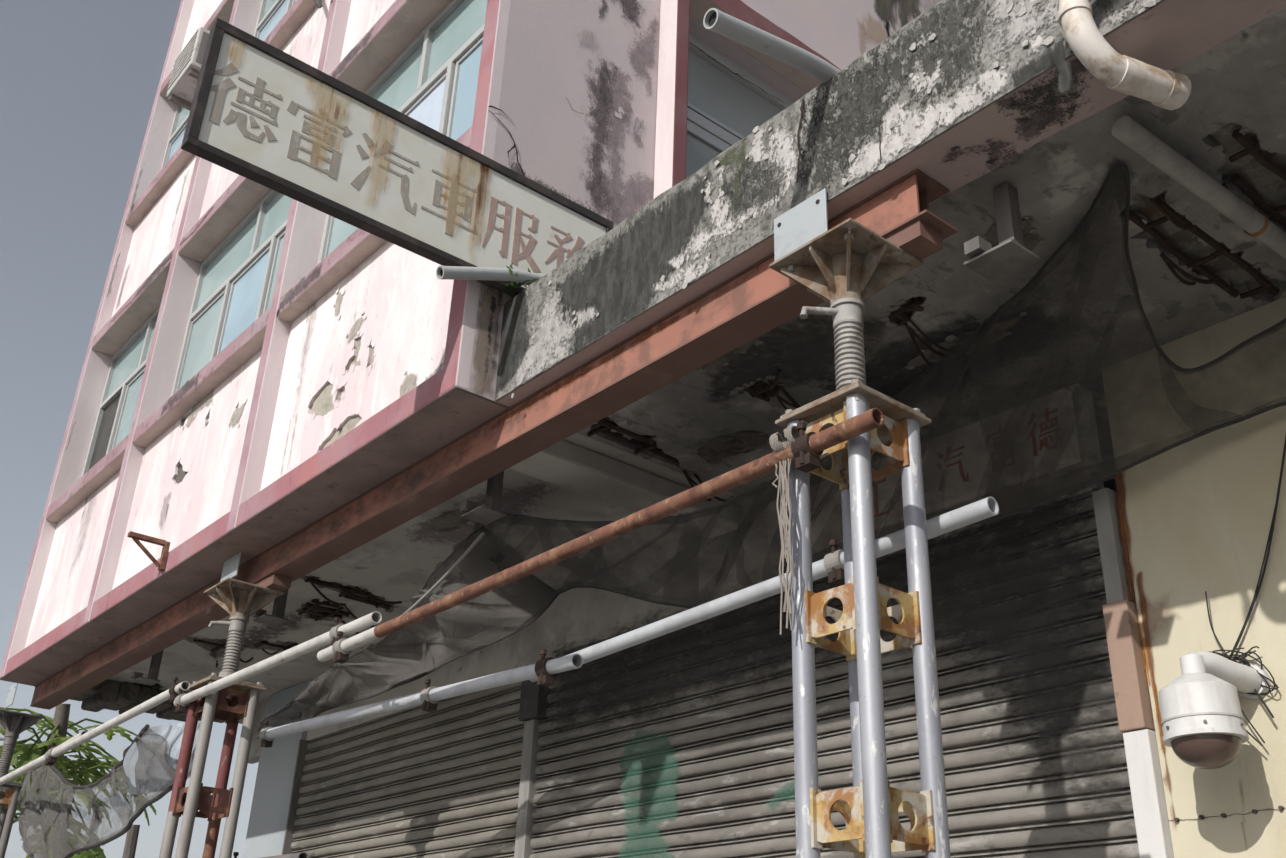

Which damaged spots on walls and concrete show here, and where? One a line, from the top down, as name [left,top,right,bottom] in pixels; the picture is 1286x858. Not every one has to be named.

leakage [510,0,993,356]
spalling [1205,122,1286,232]
spalling [1122,185,1286,305]
spalling [307,287,377,453]
peeling [398,358,444,399]
leakage [707,315,836,402]
spalling [587,416,770,487]
spalling [294,574,402,634]